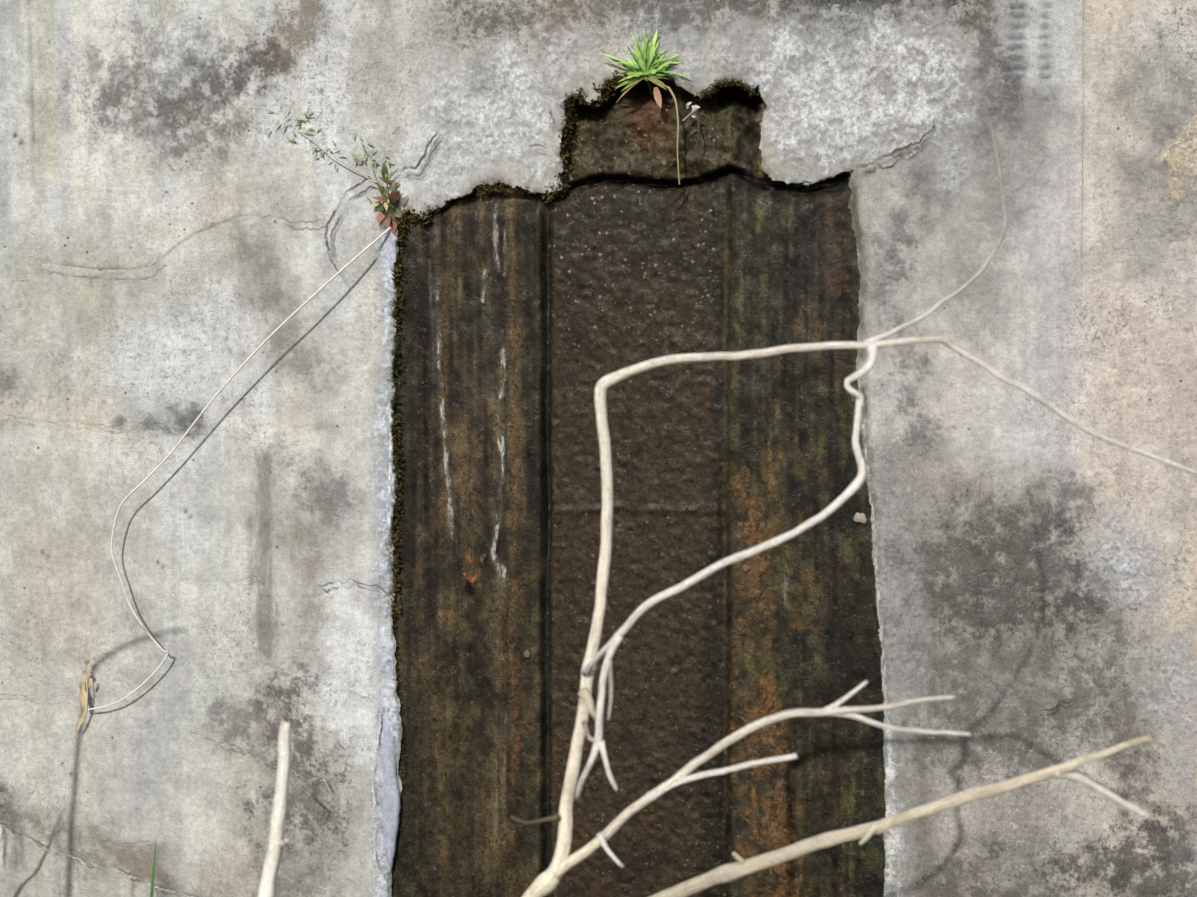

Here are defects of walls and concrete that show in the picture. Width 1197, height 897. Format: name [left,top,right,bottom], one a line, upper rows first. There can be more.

leakage [157,0,326,155]
crack [262,178,375,265]
crack [402,131,439,172]
leakage [421,0,1025,327]
leakage [880,315,953,455]
leakage [440,398,453,534]
leakage [491,525,506,578]
spalling [371,80,886,897]
rust [725,461,804,897]
leakage [858,374,1197,897]